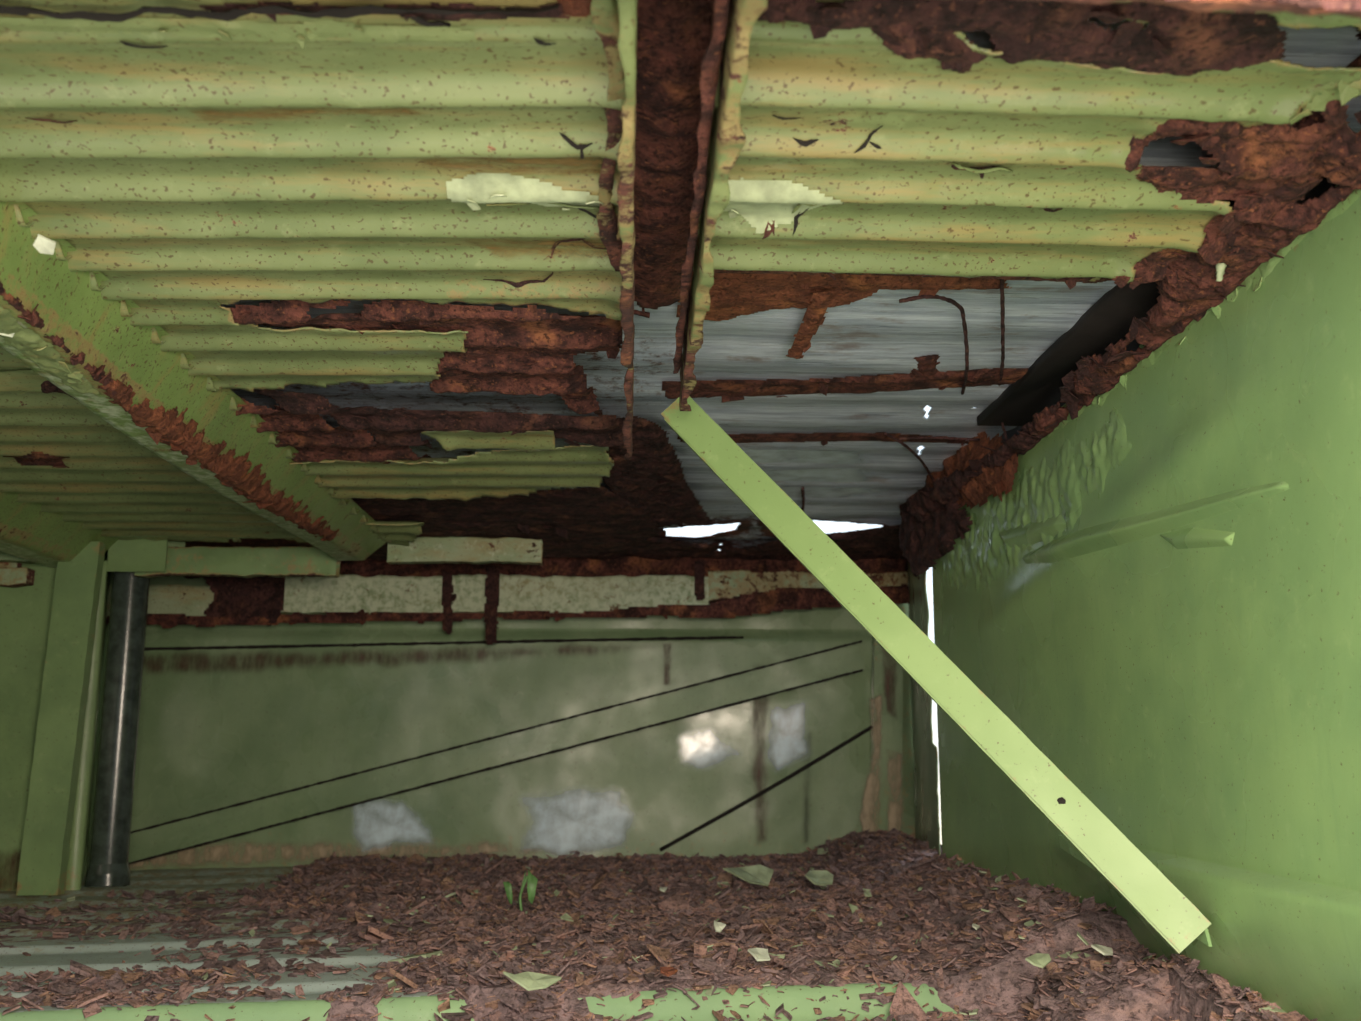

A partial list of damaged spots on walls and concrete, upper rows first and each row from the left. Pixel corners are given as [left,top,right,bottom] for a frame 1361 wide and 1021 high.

rust [199,1,358,22]
rust [372,0,592,21]
rust [757,0,1361,76]
rust [428,157,603,174]
rust [662,108,1361,604]
rust [0,282,340,541]
rust [147,299,842,645]
peeling [805,870,833,886]
peeling [748,948,770,961]
peeling [1025,953,1051,968]
peeling [1091,944,1113,955]